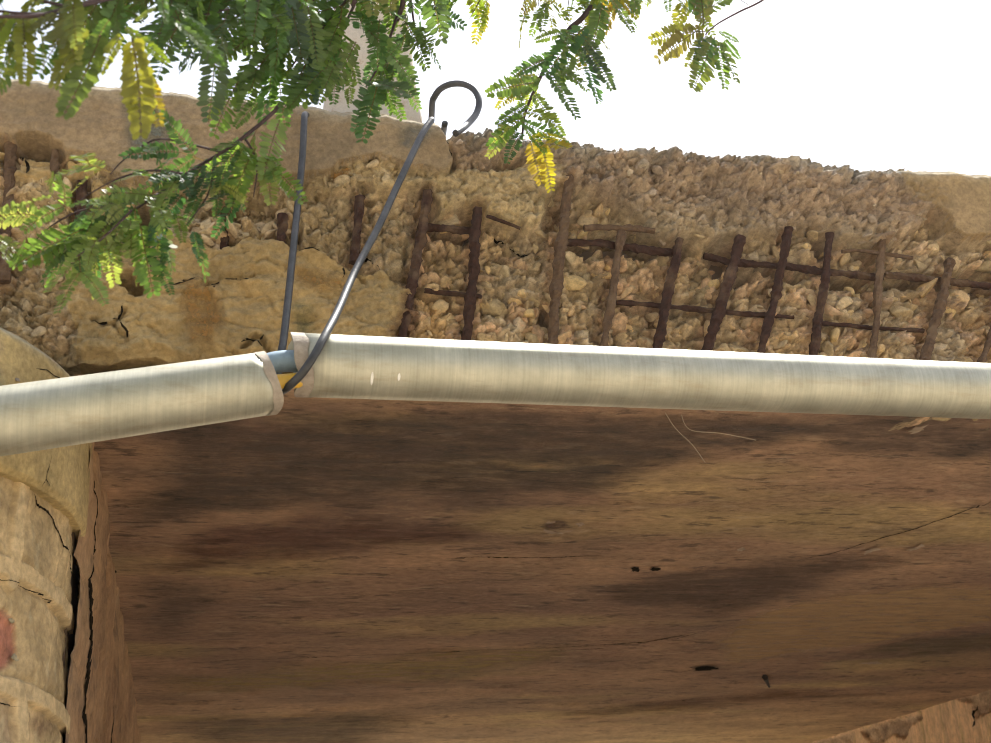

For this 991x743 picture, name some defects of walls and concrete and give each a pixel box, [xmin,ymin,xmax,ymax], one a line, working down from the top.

spalling [0,128,991,377]
spalling [889,417,951,434]
crack [809,502,990,558]
crack [0,579,51,603]
crack [34,465,98,743]
spalling [811,711,923,743]